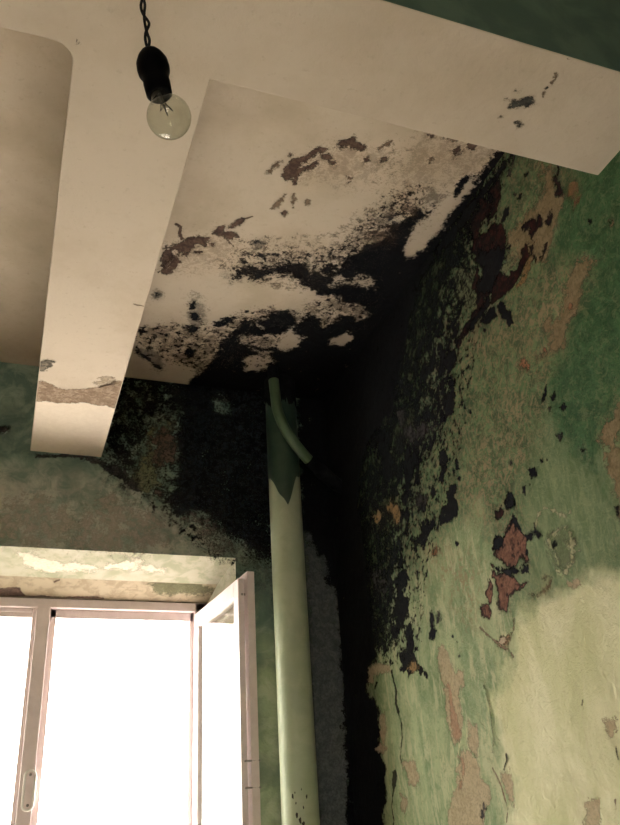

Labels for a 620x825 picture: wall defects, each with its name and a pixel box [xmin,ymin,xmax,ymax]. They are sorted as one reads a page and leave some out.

spalling [500,90,535,118]
peeling [427,134,477,156]
spalling [158,251,199,275]
spalling [36,360,122,408]
water stain [541,384,567,412]
water stain [35,150,515,825]
spalling [480,515,542,620]
crack [374,670,403,825]
peeling [437,645,492,825]